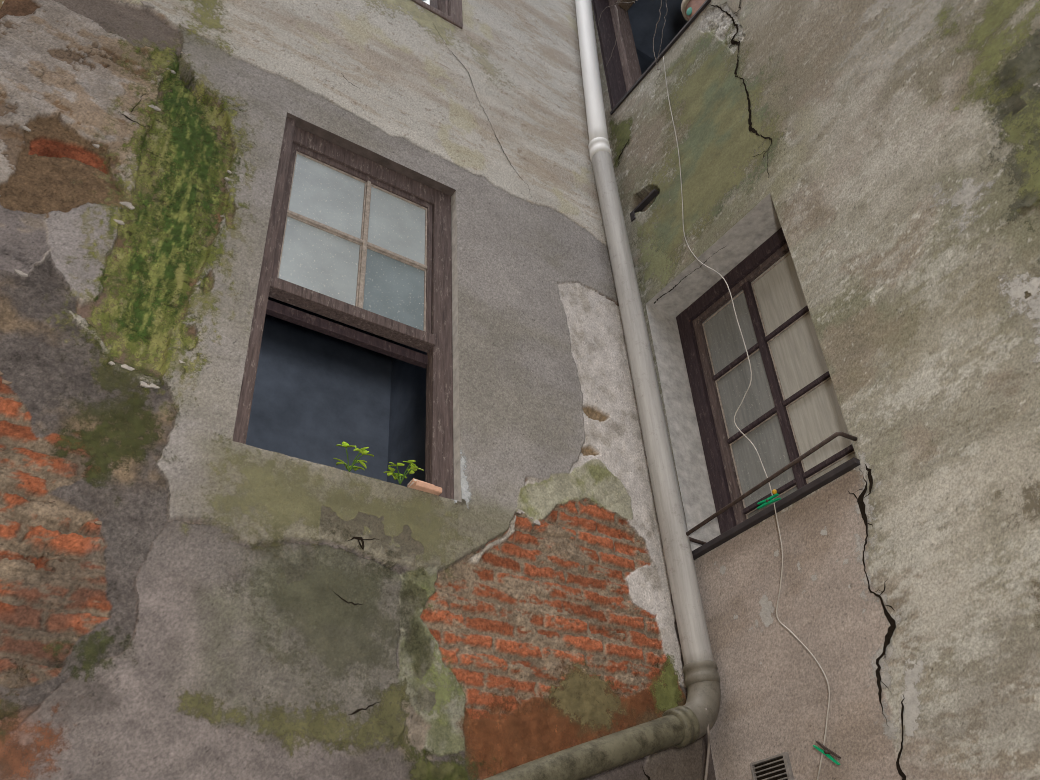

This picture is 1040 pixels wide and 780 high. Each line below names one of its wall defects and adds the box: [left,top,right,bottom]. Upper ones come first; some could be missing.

crack [709,0,772,178]
water stain [999,83,1040,211]
flaking render [0,0,215,718]
spalling [407,478,442,496]
spalling [421,280,685,721]
crack [848,464,906,780]